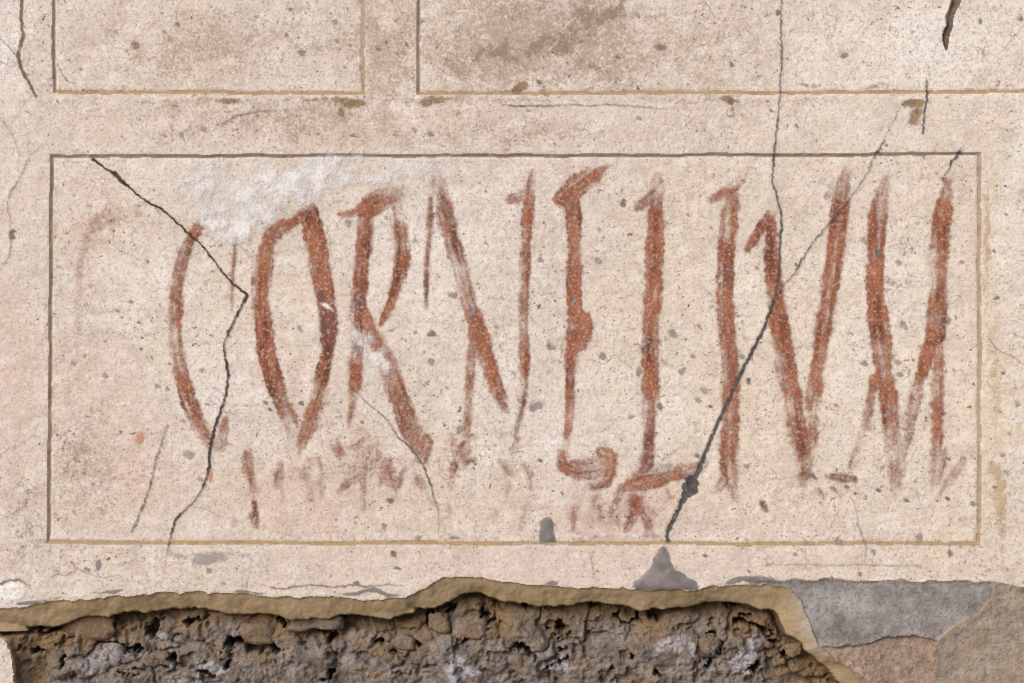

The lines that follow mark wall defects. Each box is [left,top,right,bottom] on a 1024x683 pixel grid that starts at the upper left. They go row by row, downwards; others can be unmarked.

crack [16,0,36,97]
crack [920,79,928,134]
crack [665,0,885,542]
crack [91,157,248,550]
spalling [0,570,868,683]